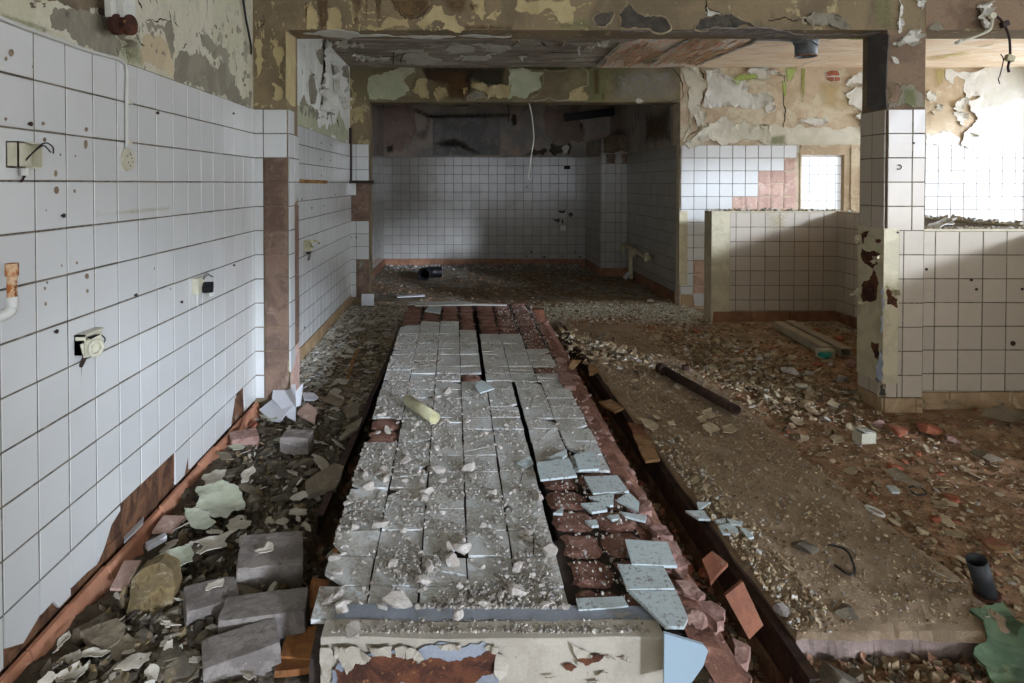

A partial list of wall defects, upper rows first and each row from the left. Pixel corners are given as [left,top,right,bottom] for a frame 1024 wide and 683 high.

flaking render [892,0,1024,64]
peeling [30,0,672,156]
water stain [437,139,475,152]
water stain [415,105,517,138]
peeling [681,66,863,211]
crack [778,25,861,127]
peeling [887,67,1024,152]
rust [850,231,901,308]
peeling [84,454,174,579]
peeling [154,530,235,567]
peeling [320,645,424,681]
peeling [484,644,509,681]